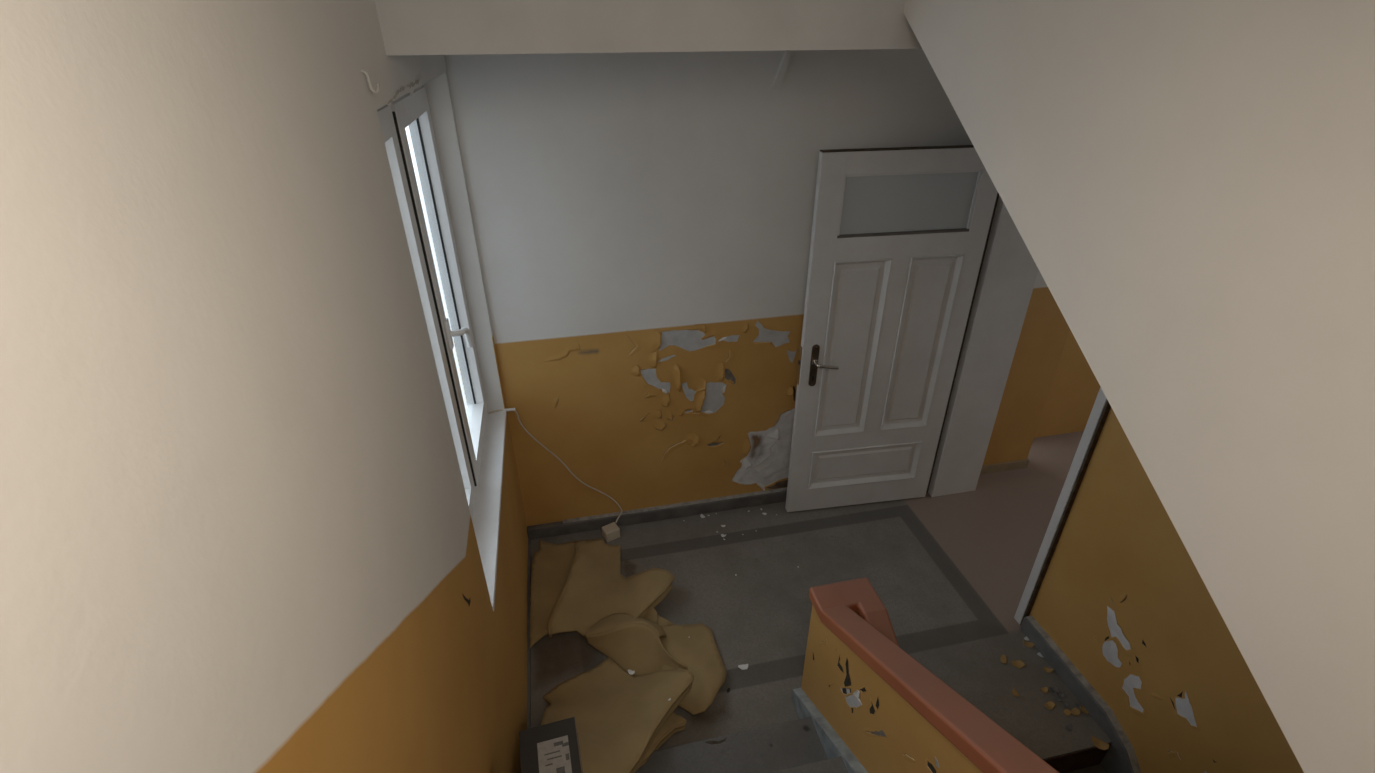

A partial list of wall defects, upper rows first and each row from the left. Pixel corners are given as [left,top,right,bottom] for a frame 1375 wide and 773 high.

peeling [629,320,797,417]
peeling [732,408,795,491]
peeling [840,687,862,711]
peeling [1102,605,1148,718]
peeling [1174,690,1201,731]